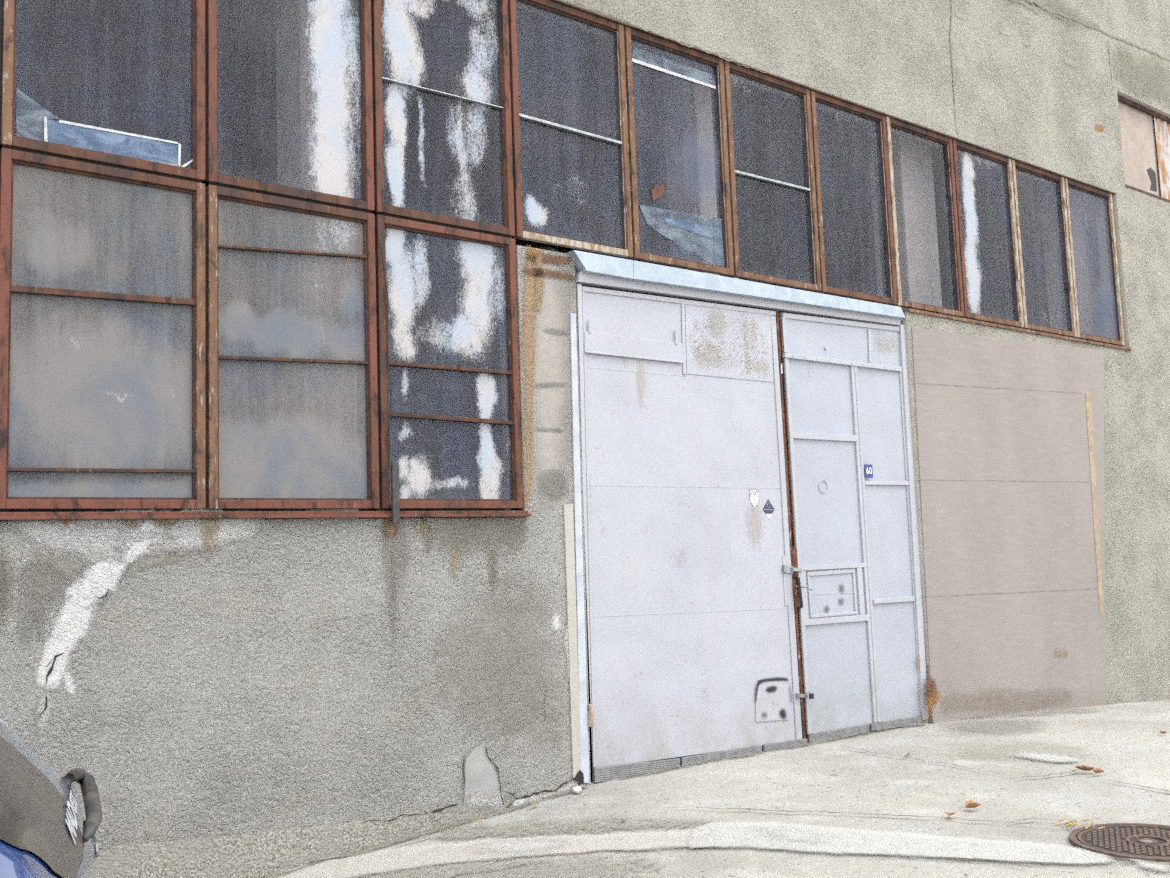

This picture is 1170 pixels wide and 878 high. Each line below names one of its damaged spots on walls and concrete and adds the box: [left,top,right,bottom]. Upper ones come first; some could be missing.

crack [950,0,959,136]
crack [1011,0,1170,83]
corrosion [522,248,575,506]
flaking render [15,519,264,733]
corrosion [918,655,939,717]
crack [295,749,574,867]